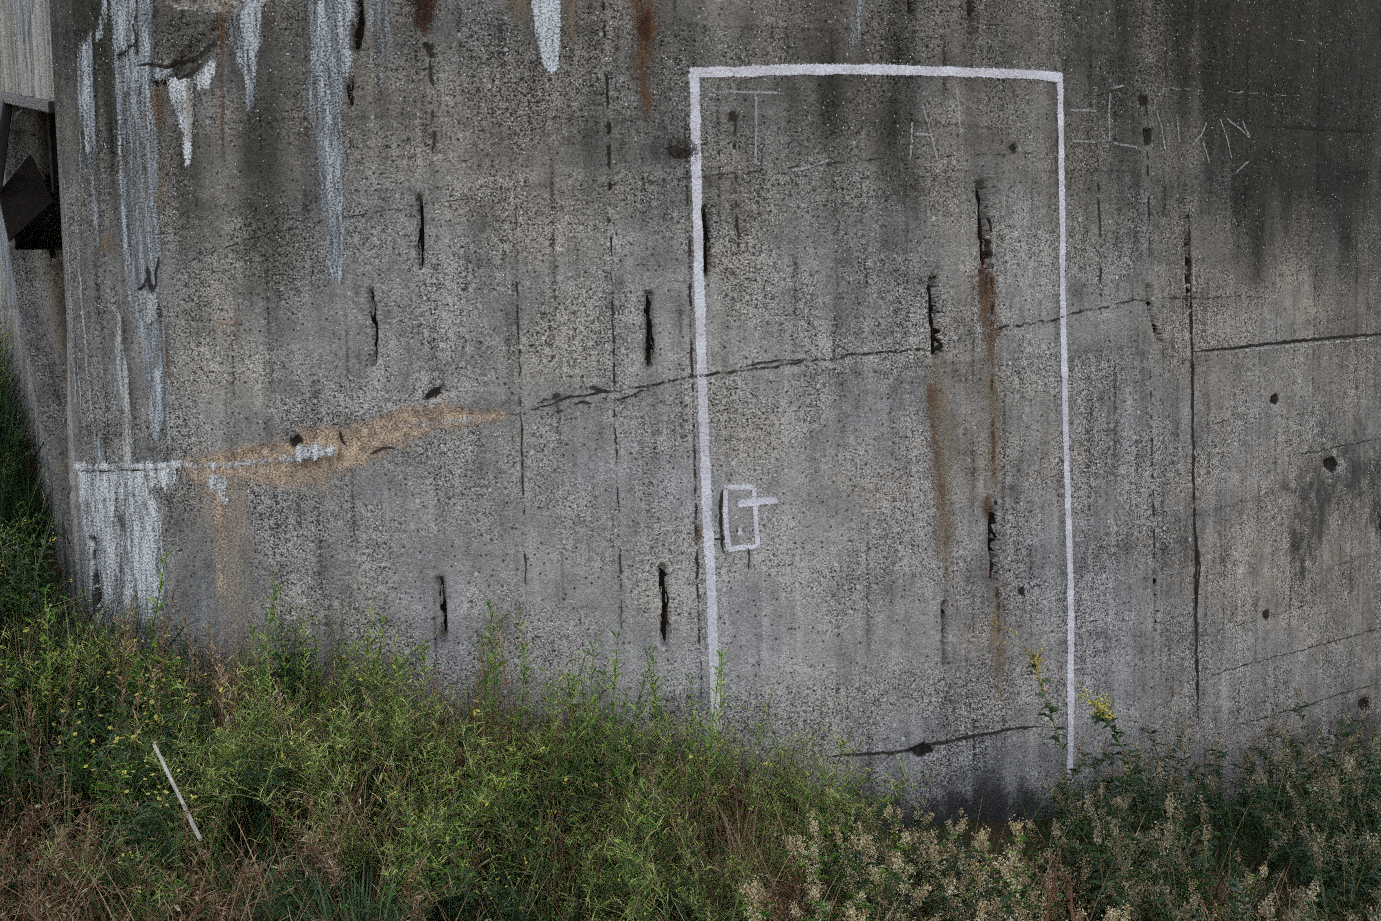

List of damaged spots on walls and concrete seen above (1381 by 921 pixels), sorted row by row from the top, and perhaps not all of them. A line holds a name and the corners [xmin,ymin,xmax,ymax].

efflorescence [230,0,277,110]
rust [407,0,437,85]
crack [600,1,608,38]
efflorescence [307,0,392,285]
efflorescence [77,0,167,444]
crack [512,74,1381,726]
rust [974,225,1001,518]
water stain [78,465,161,614]
spalling [1366,456,1381,538]
crack [826,726,1044,757]